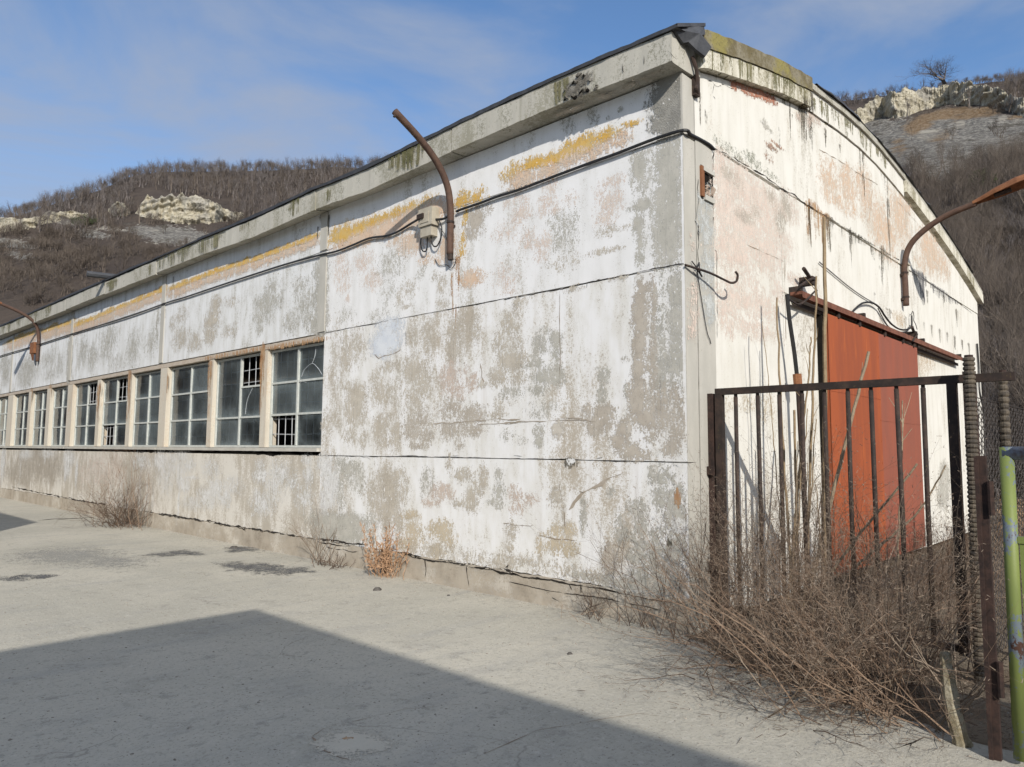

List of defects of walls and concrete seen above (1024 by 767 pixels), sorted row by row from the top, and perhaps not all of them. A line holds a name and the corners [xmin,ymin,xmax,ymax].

water stain [388,143,423,170]
water stain [701,50,886,196]
water stain [825,182,891,280]
water stain [911,267,958,317]
peeling [0,70,802,615]
crack [14,487,104,520]
crack [159,513,677,610]